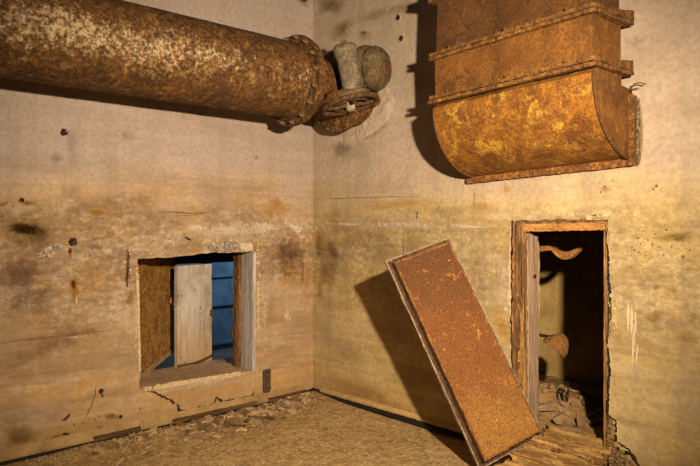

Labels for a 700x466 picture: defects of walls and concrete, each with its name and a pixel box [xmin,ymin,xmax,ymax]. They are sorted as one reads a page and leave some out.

water stain [13,224,37,234]
spalling [37,245,60,258]
spalling [206,242,259,255]
crack [122,250,133,288]
crack [0,330,110,344]
crack [143,389,254,412]